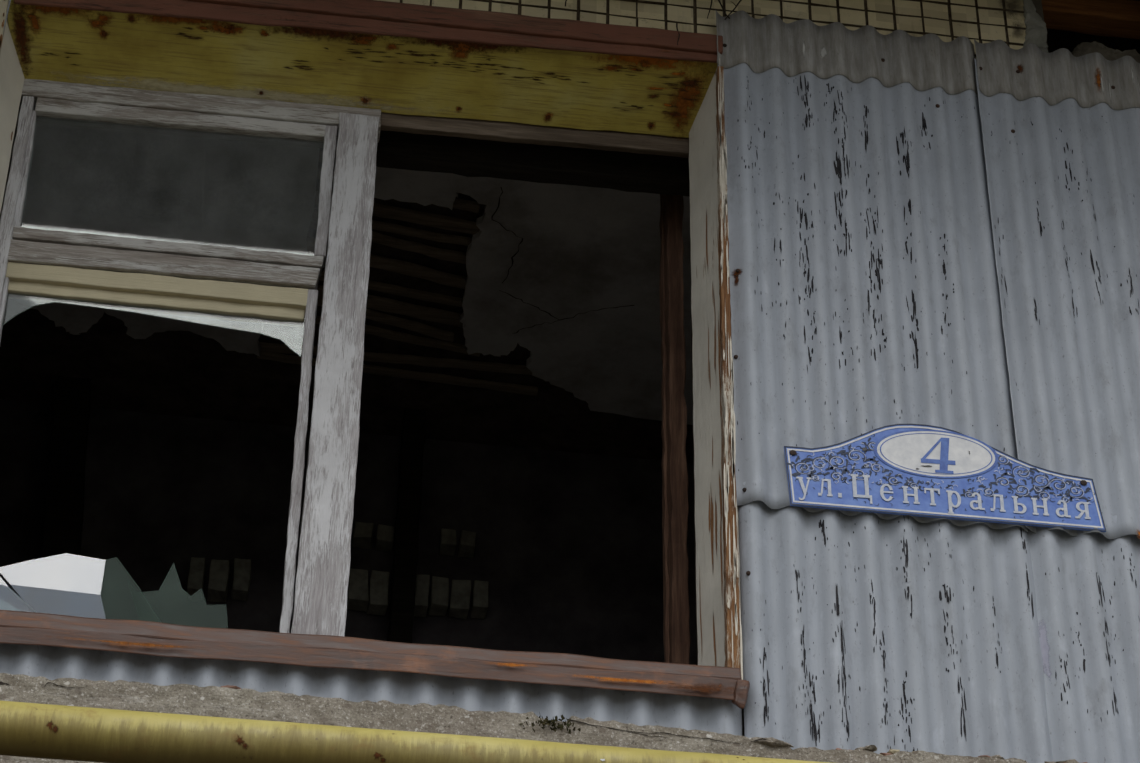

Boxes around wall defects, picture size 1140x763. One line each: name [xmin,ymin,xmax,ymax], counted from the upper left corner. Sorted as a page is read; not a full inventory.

corrosion [12,5,112,75]
corrosion [128,14,244,34]
corrosion [261,20,522,59]
peeling [755,75,887,372]
peeling [614,58,777,726]
peeling [903,275,927,371]
peeling [896,515,931,619]
peeling [796,585,860,746]
peeling [845,565,918,752]
peeling [939,583,974,737]
peeling [1055,612,1086,704]
peeling [1096,573,1124,722]